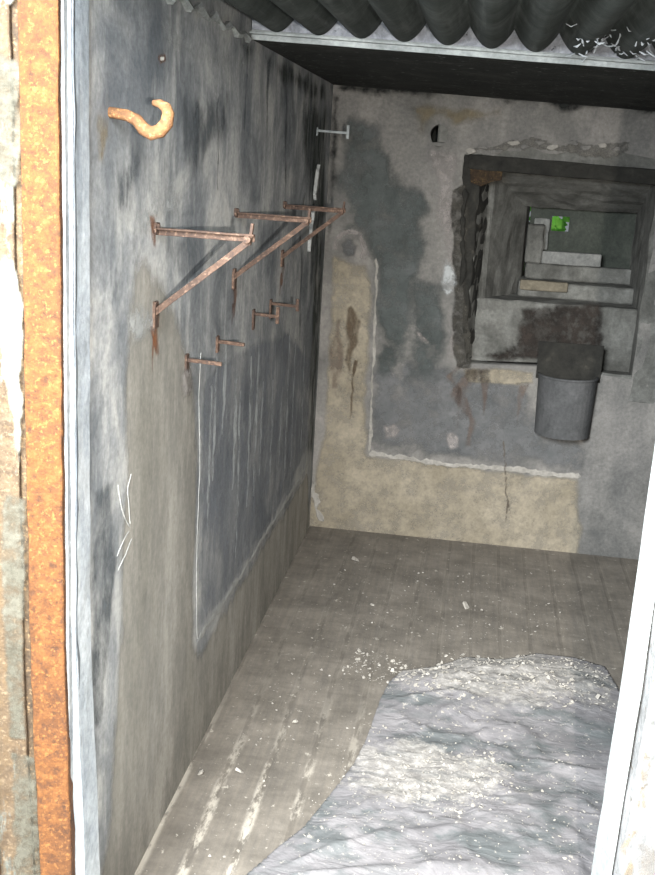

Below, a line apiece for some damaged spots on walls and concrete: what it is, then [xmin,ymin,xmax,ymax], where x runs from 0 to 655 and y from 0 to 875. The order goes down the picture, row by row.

water stain [119,157,138,205]
water stain [184,102,225,164]
water stain [203,108,326,616]
rust [346,307,360,410]
water stain [339,119,582,470]
water stain [93,487,115,721]